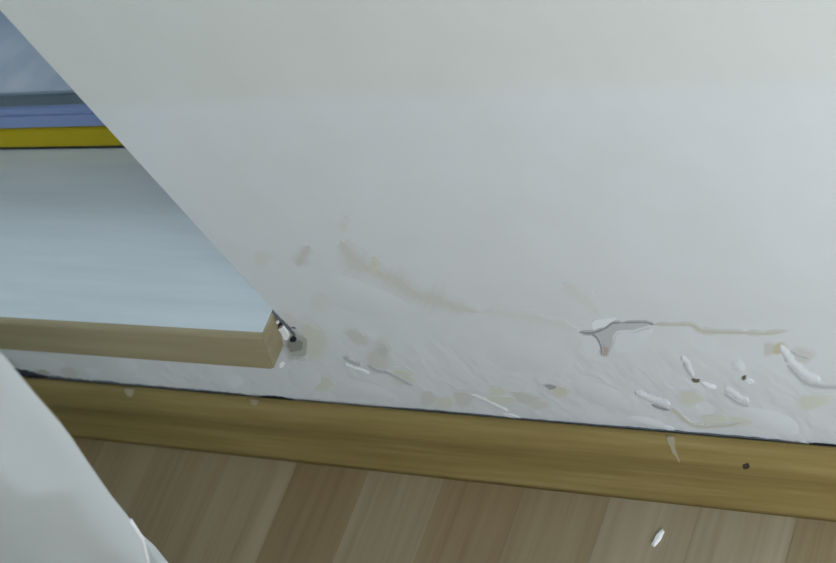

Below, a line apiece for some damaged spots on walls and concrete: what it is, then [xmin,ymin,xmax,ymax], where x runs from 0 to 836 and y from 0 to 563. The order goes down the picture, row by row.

peeling [582,317,648,356]
crack [579,320,788,355]
crack [343,356,413,386]
crack [787,351,836,390]
crack [14,368,836,447]